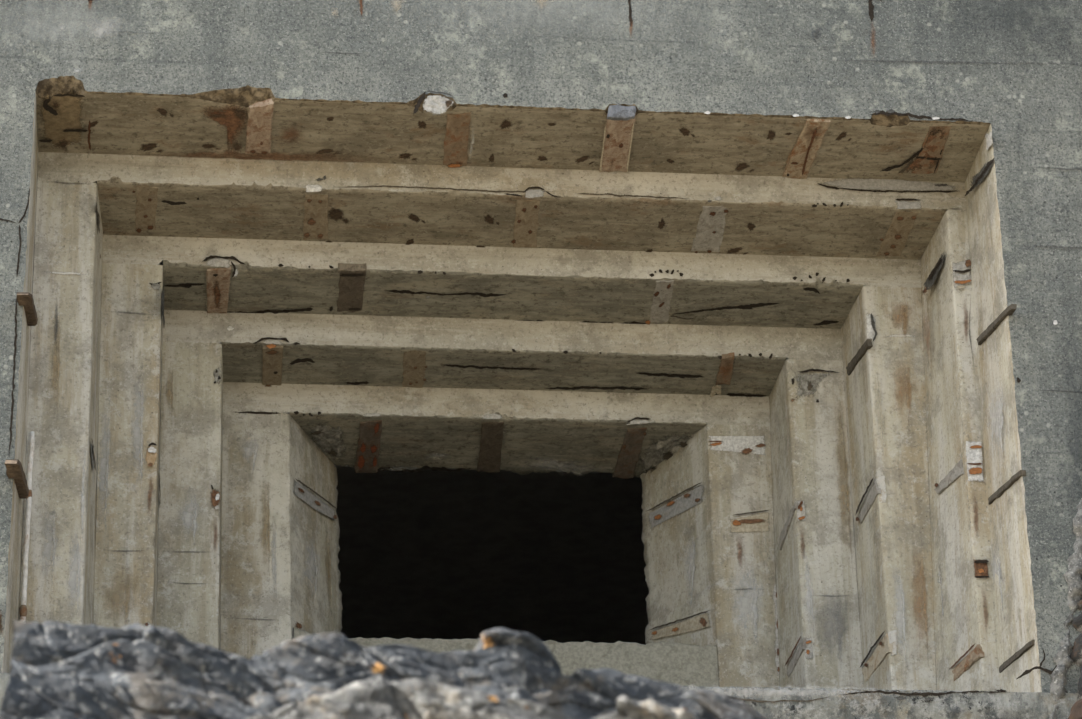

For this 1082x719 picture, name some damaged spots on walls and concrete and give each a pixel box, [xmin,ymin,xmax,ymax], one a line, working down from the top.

spalling [413,91,453,129]
crack [386,290,505,298]
crack [804,286,820,294]
crack [0,188,30,451]
crack [583,303,780,324]
crack [814,319,838,327]
rust [973,559,989,578]